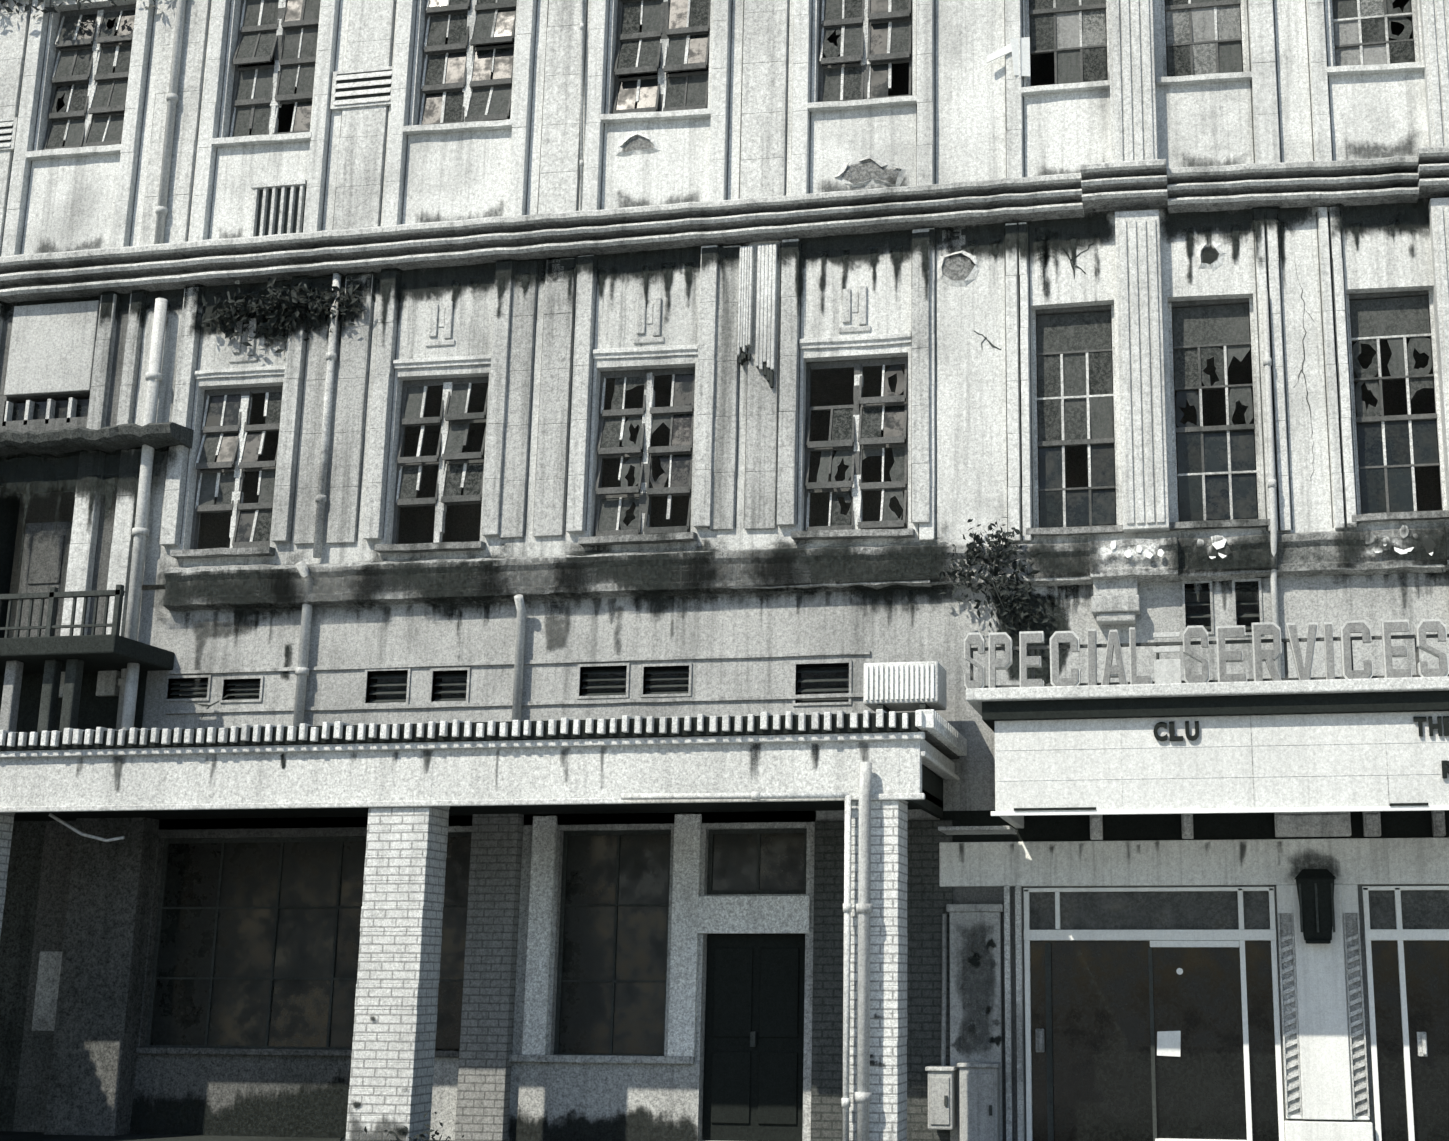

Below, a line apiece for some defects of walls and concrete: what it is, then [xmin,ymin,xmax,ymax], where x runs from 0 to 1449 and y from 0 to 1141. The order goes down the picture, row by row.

spalling [615,131,661,157]
spalling [835,153,906,188]
water stain [778,211,1115,312]
spalling [937,250,980,286]
water stain [1160,198,1431,283]
water stain [152,526,953,679]
water stain [1334,519,1449,608]